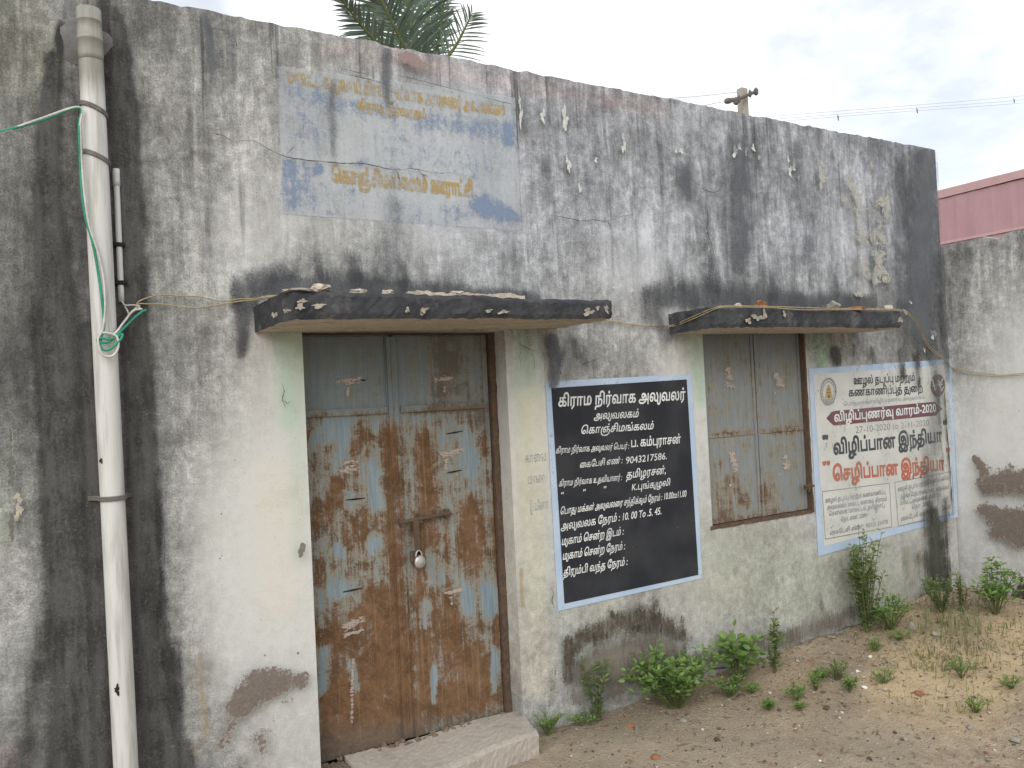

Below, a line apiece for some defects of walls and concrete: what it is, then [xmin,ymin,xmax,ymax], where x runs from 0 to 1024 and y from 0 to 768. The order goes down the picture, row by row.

damp [17,21,113,768]
damp [98,0,194,768]
spalling [271,298,326,318]
crack [213,133,472,181]
damp [730,135,768,271]
damp [643,202,877,340]
damp [832,346,855,366]
peeling [842,173,895,300]
damp [895,149,951,597]
spalling [971,454,1024,555]
spalling [236,716,274,768]
spalling [216,655,310,752]